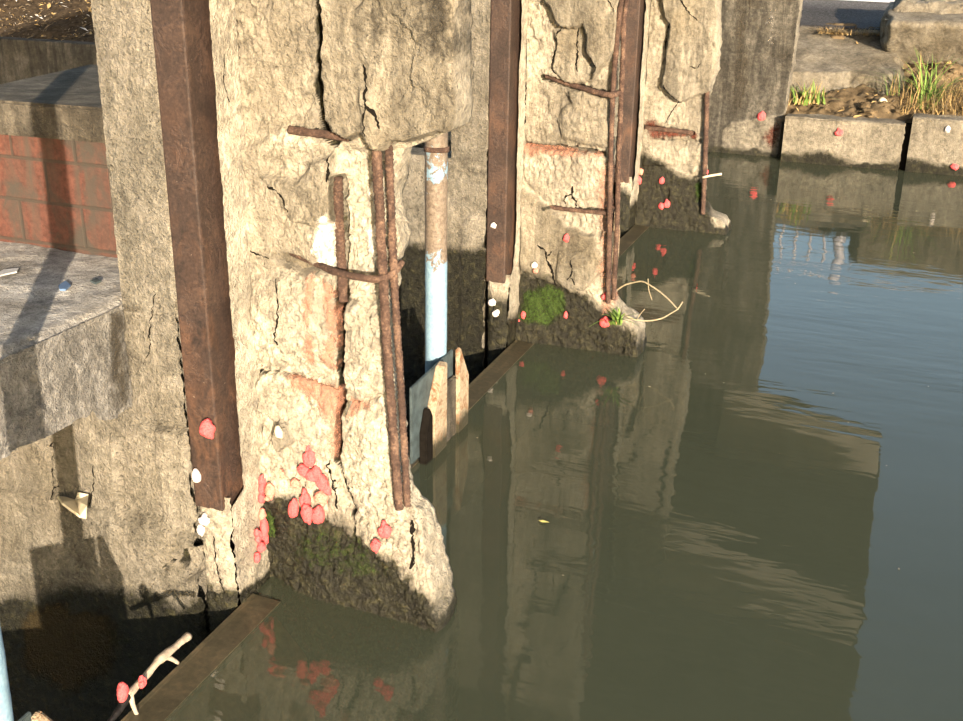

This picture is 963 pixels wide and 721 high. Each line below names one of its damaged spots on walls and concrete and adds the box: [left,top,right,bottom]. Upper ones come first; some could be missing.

crack [551,28,596,74]
crack [665,0,697,50]
crack [362,64,380,137]
rust [524,143,577,156]
spalling [522,0,630,304]
rust [645,121,697,139]
spalling [642,90,710,215]
spalling [235,0,420,525]
rust [599,164,618,311]
crack [213,536,225,594]